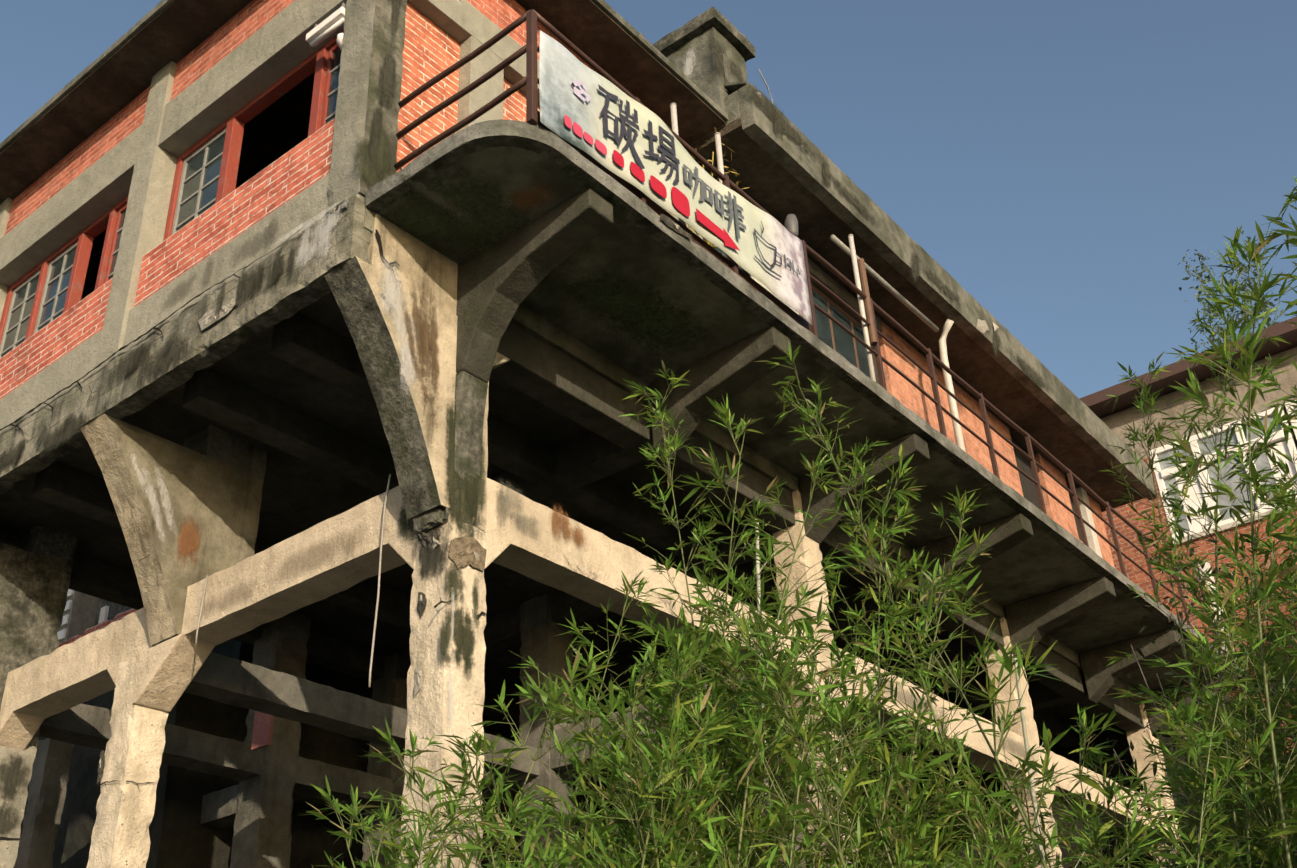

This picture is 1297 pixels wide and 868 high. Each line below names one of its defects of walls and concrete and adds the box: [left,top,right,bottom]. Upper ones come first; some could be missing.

water stain [392,0,400,34]
water stain [404,290,485,525]
water stain [399,507,414,541]
corrosion [553,509,583,545]
water stain [419,547,429,575]
spalling [418,532,487,571]
water stain [440,561,479,674]
water stain [0,756,30,834]